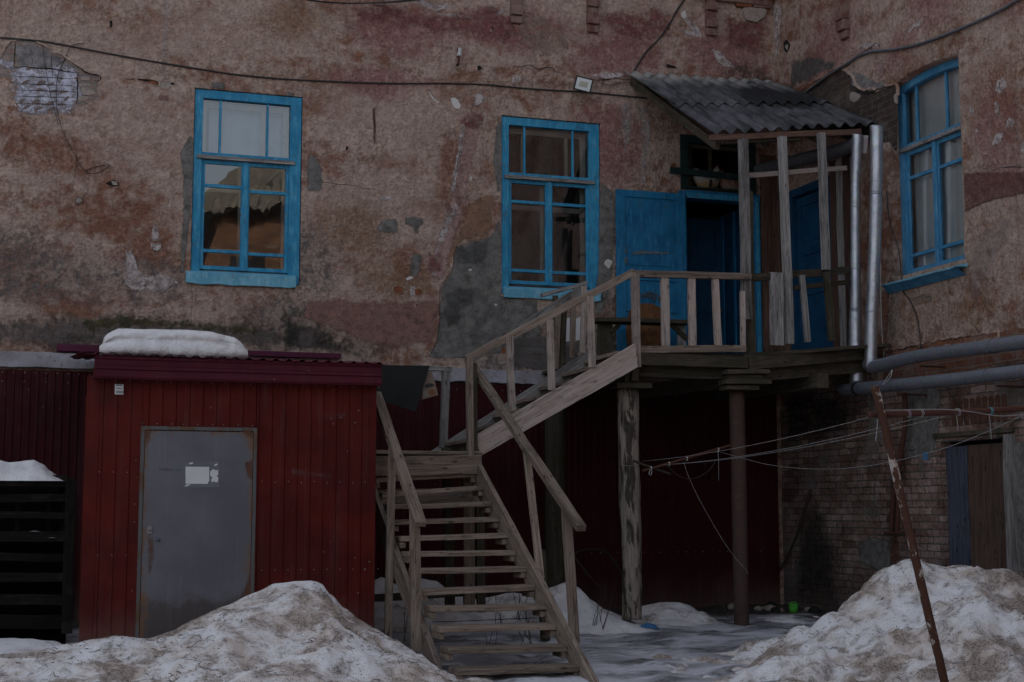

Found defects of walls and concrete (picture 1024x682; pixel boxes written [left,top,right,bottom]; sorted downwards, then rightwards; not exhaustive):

flaking render [735,2,792,60]
spalling [0,37,101,118]
spalling [795,42,900,151]